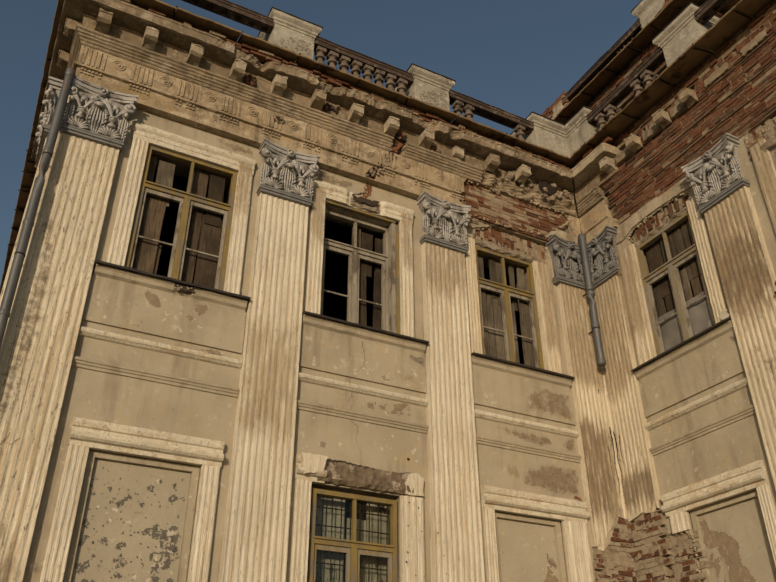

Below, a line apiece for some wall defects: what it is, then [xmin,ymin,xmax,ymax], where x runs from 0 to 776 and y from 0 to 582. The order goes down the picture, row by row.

flaking render [460,170,579,270]
water stain [715,230,770,307]
peeling [144,291,209,332]
spalling [317,461,414,496]
water stain [525,418,654,520]
crack [608,427,623,497]
peeling [76,467,185,582]
peeling [543,554,559,582]
flaking render [592,500,757,582]